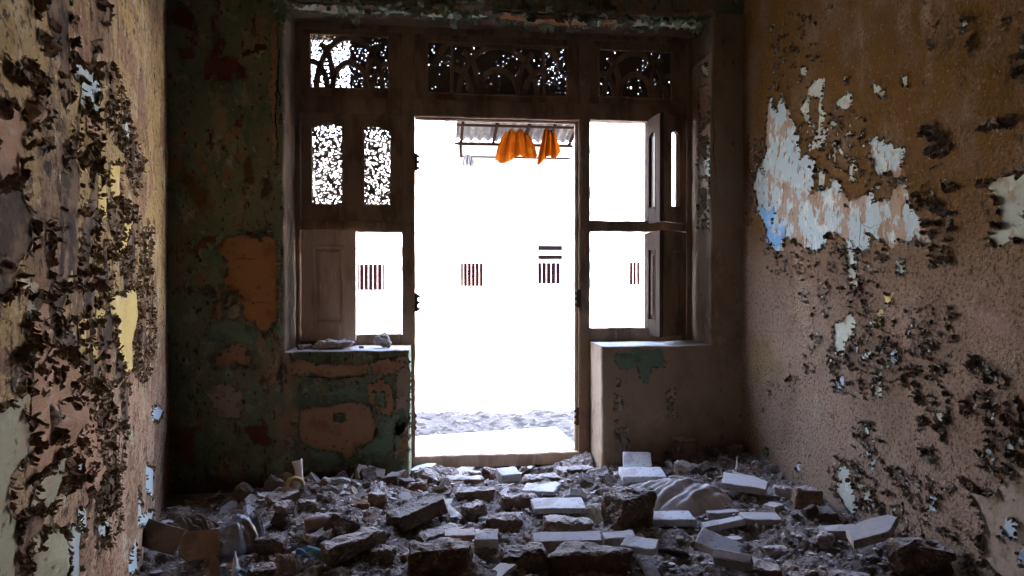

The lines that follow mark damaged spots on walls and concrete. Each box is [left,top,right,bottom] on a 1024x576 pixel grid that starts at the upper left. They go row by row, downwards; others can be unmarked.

peeling [292,0,716,35]
peeling [0,0,158,576]
peeling [151,402,164,425]
peeling [204,225,414,464]
peeling [613,348,666,451]
peeling [744,3,1024,576]